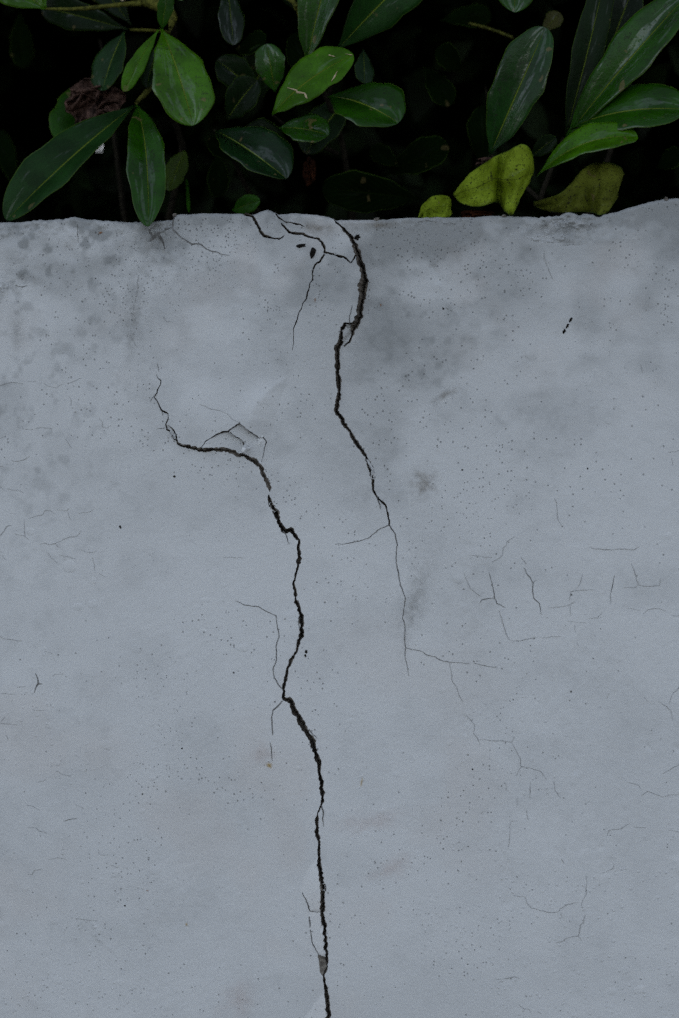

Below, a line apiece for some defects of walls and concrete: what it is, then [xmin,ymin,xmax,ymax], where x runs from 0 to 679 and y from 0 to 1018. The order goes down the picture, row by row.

crack [149,218,226,255]
spalling [203,422,266,462]
crack [244,211,561,846]
crack [151,364,331,1018]
peeling [301,858,327,976]
peeling [305,994,326,1018]